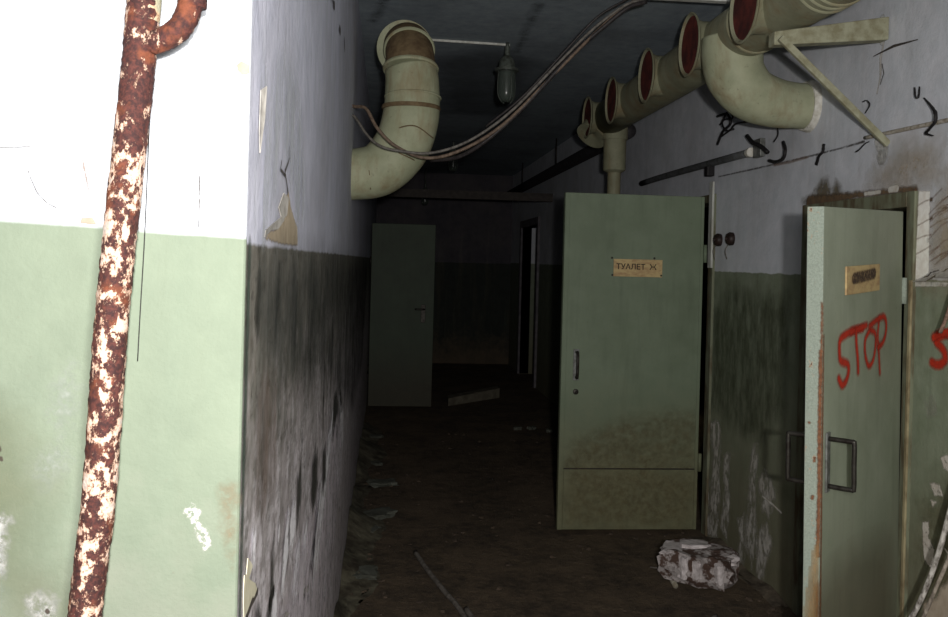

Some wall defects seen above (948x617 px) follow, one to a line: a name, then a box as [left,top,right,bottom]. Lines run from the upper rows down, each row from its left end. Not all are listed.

water stain [0,517,9,574]
water stain [27,596,55,617]
water stain [239,243,367,617]
rust [807,303,824,617]